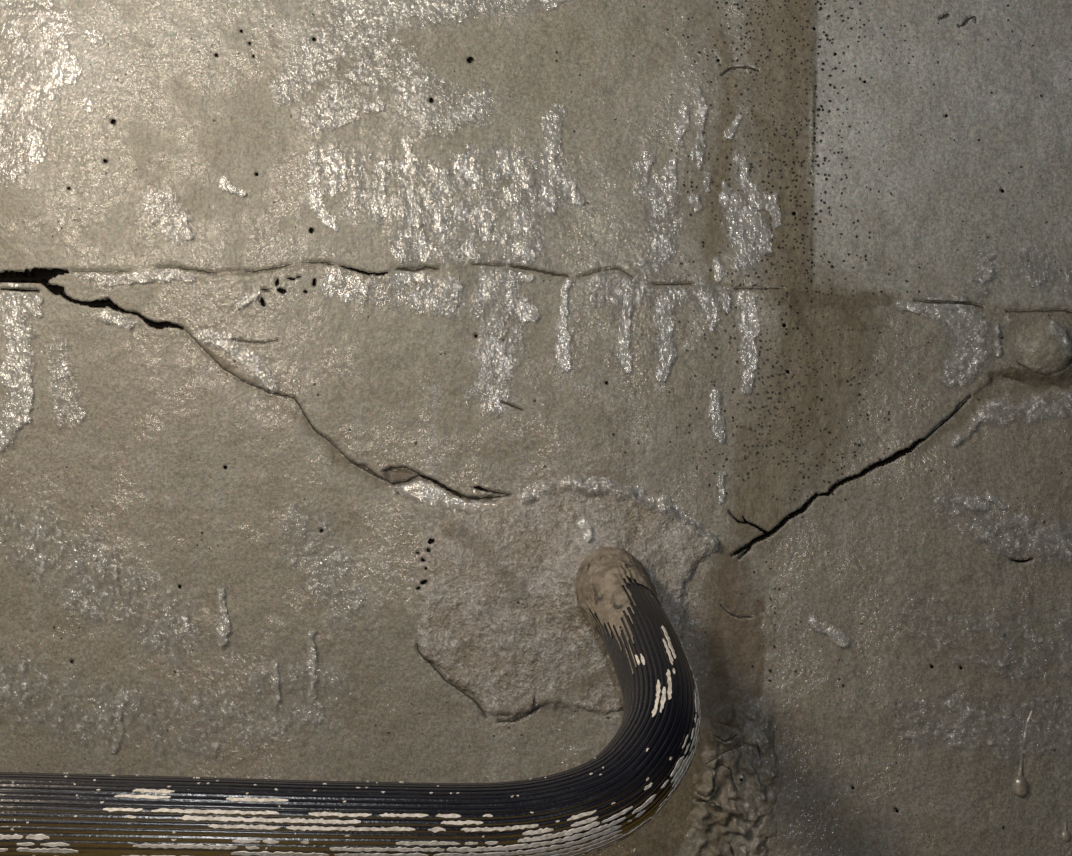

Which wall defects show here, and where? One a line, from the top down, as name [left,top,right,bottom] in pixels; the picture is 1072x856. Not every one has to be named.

crack [0,267,511,500]
crack [247,262,439,275]
leakage [271,0,585,416]
crack [472,264,691,285]
crack [918,300,1071,312]
crack [729,396,971,559]